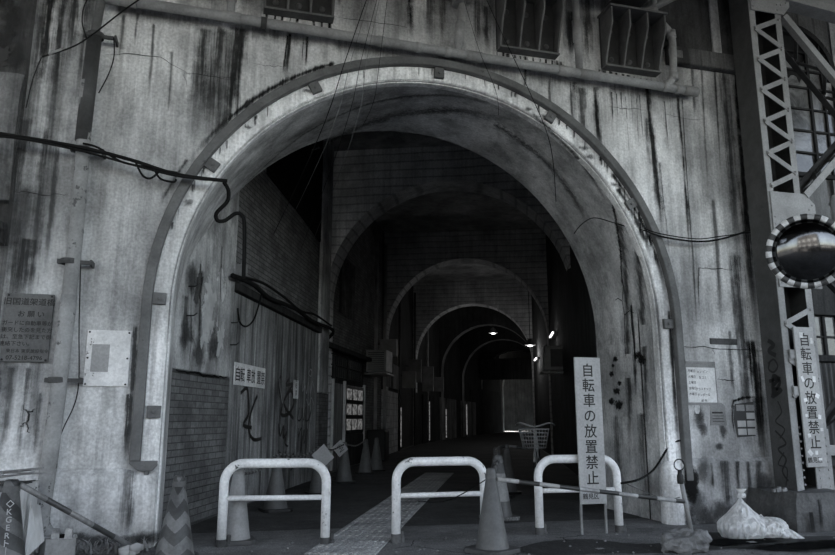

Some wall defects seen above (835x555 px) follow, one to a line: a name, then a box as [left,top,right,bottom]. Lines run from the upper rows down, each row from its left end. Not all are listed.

leakage [474,0,488,40]
leakage [195,28,334,139]
leakage [664,98,699,301]
leakage [714,72,764,447]
crack [20,405,34,433]
leakage [684,461,761,525]